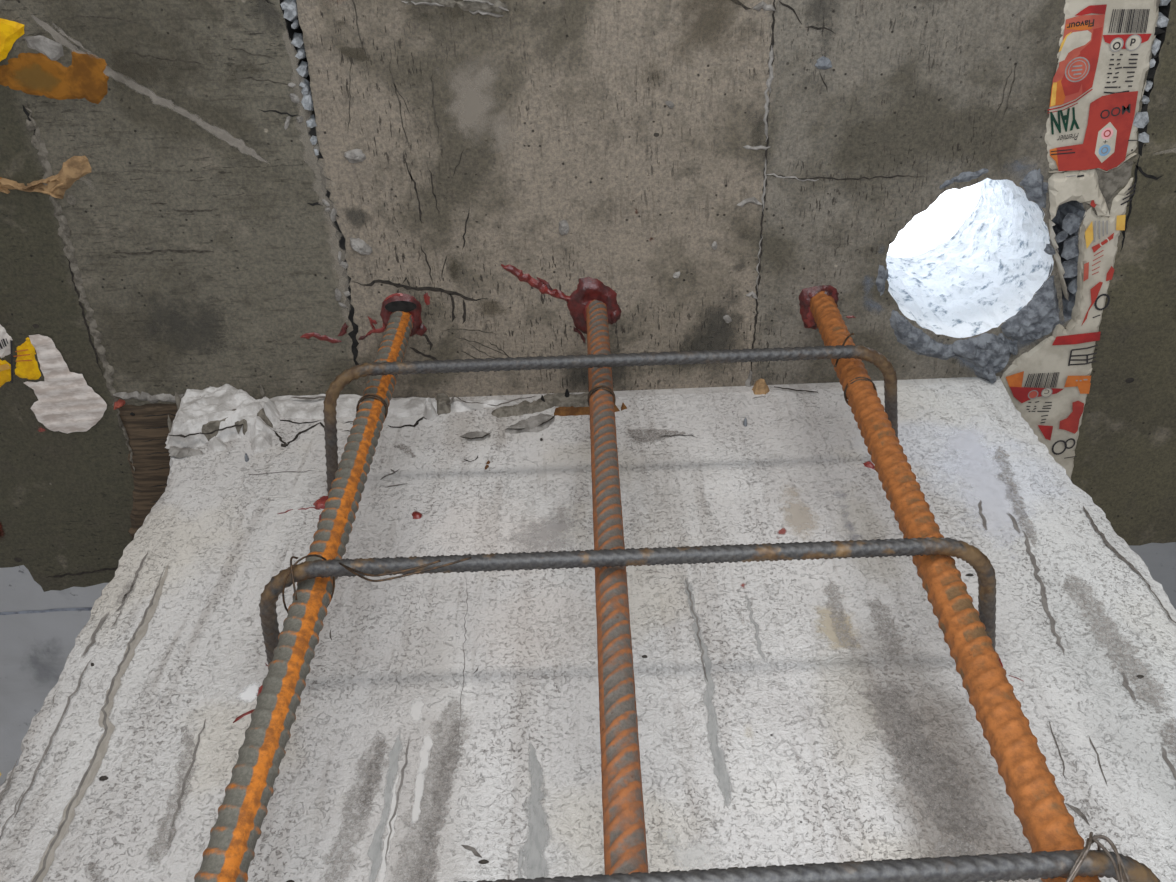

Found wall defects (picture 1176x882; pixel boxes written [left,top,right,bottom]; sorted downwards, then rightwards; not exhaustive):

crack [113,248,213,256]
crack [151,202,214,213]
crack [231,0,509,365]
crack [683,0,913,398]
spalling [865,161,1086,384]
crack [1120,0,1171,252]
spalling [810,291,944,539]
spalling [194,576,338,882]
water stain [325,696,469,882]
water stain [518,744,550,879]
spalling [595,566,649,875]
spalling [912,554,1090,853]